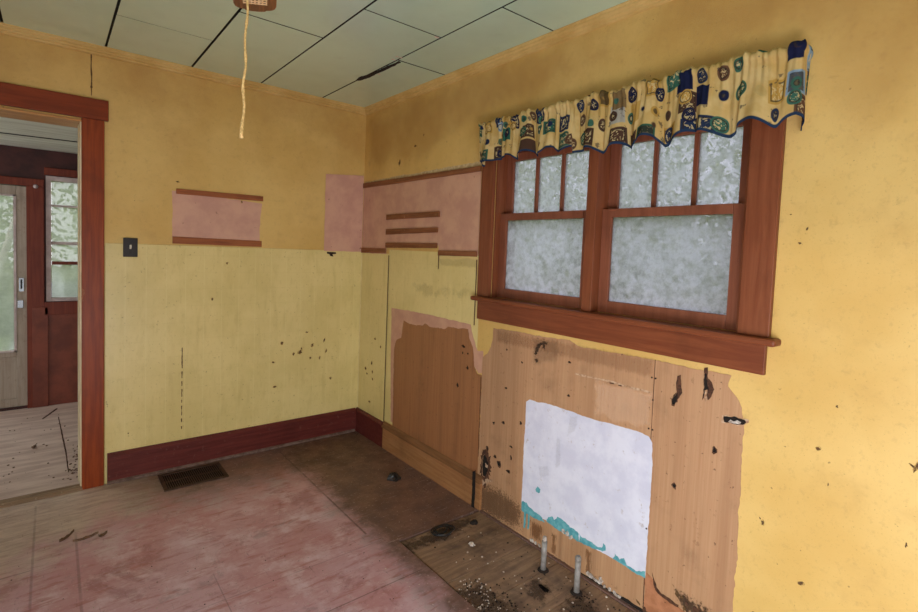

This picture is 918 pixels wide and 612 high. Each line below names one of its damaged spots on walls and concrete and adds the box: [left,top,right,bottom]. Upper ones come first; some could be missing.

crack [87,54,95,96]
peeling [374,308,749,612]
leakage [675,589,708,612]